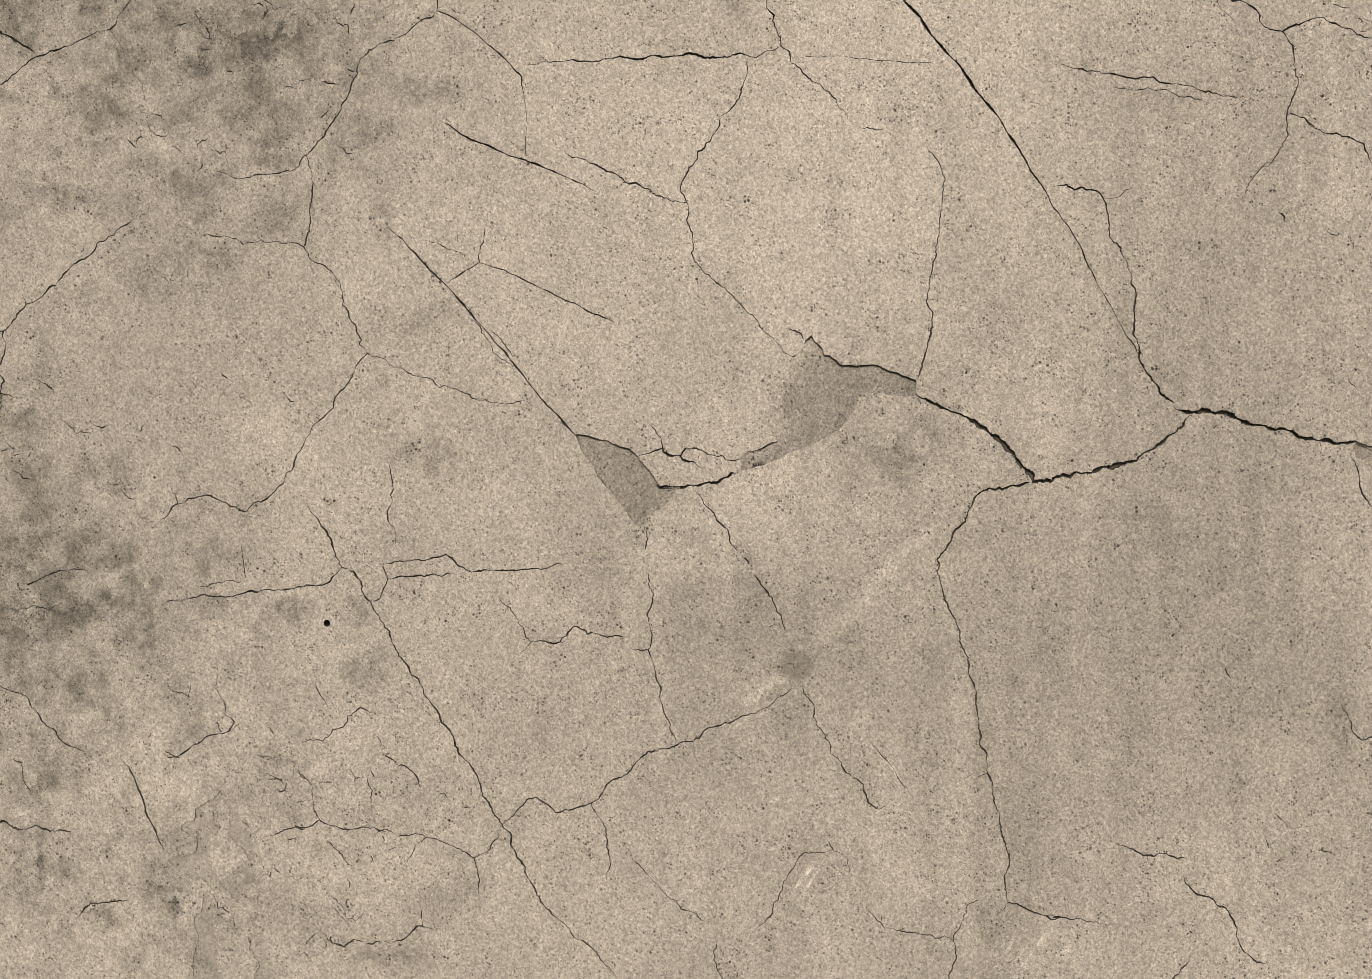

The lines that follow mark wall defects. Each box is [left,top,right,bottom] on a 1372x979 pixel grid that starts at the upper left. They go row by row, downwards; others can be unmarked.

crack [0,0,882,525]
spalling [575,434,680,527]
crack [639,424,785,630]
spalling [740,335,917,471]
crack [846,0,1372,924]
crack [0,685,85,752]
crack [148,462,911,979]
crack [0,759,71,832]
crack [123,761,164,849]
crack [77,900,127,918]
crack [866,900,978,979]
crack [1116,843,1269,964]